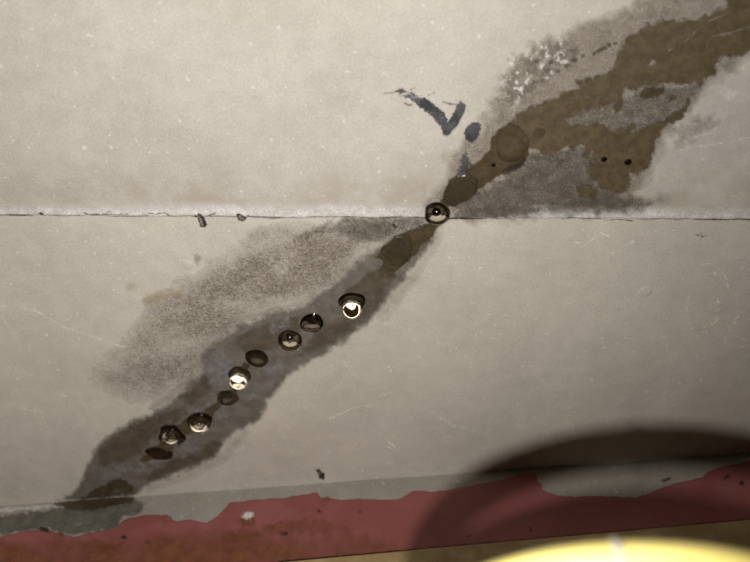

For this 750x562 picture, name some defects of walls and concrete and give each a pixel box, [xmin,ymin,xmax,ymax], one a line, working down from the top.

water stain [438,0,750,221]
water stain [0,203,440,534]
peeling [0,461,750,562]